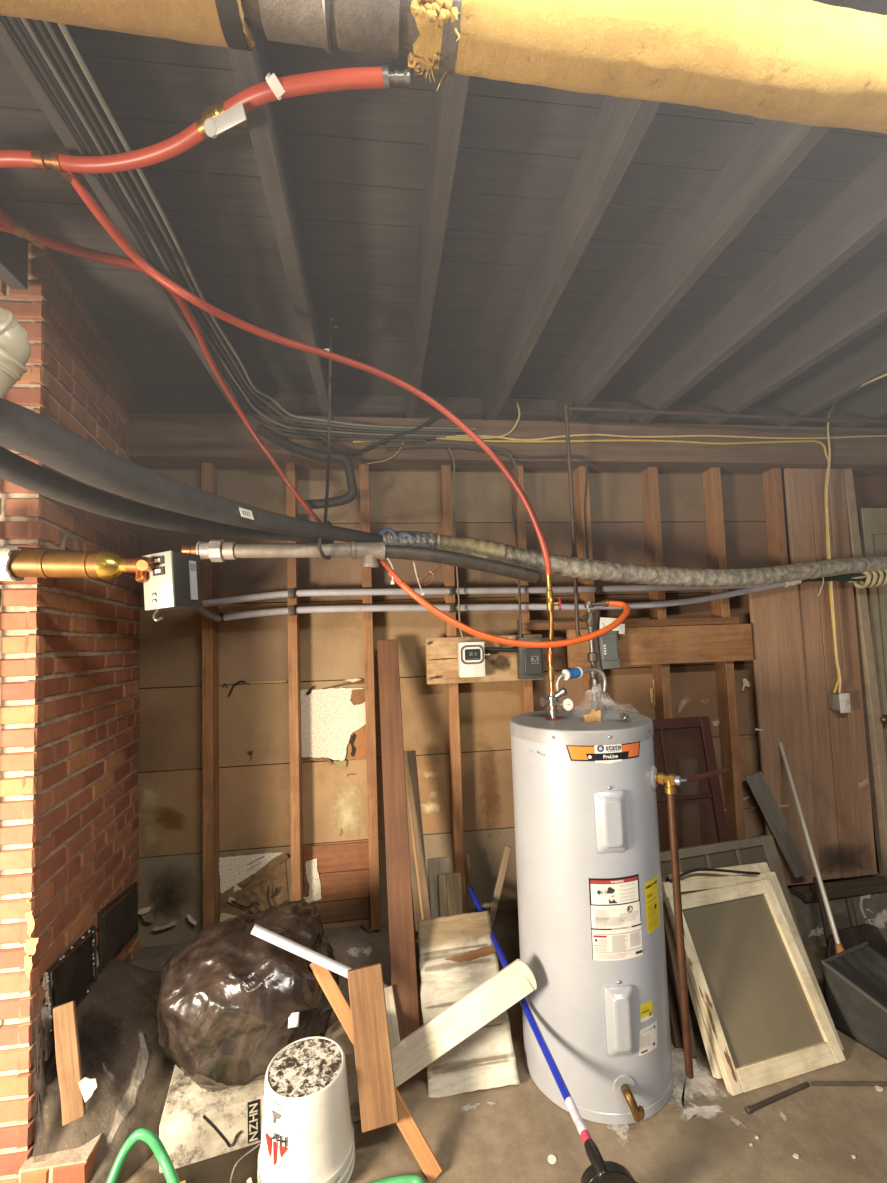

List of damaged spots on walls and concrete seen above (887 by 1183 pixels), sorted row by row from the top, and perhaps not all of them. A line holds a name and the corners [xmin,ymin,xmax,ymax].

peeling [301,678,367,767]
peeling [219,852,283,893]
spalling [24,899,38,977]
damp [669,1044,746,1128]